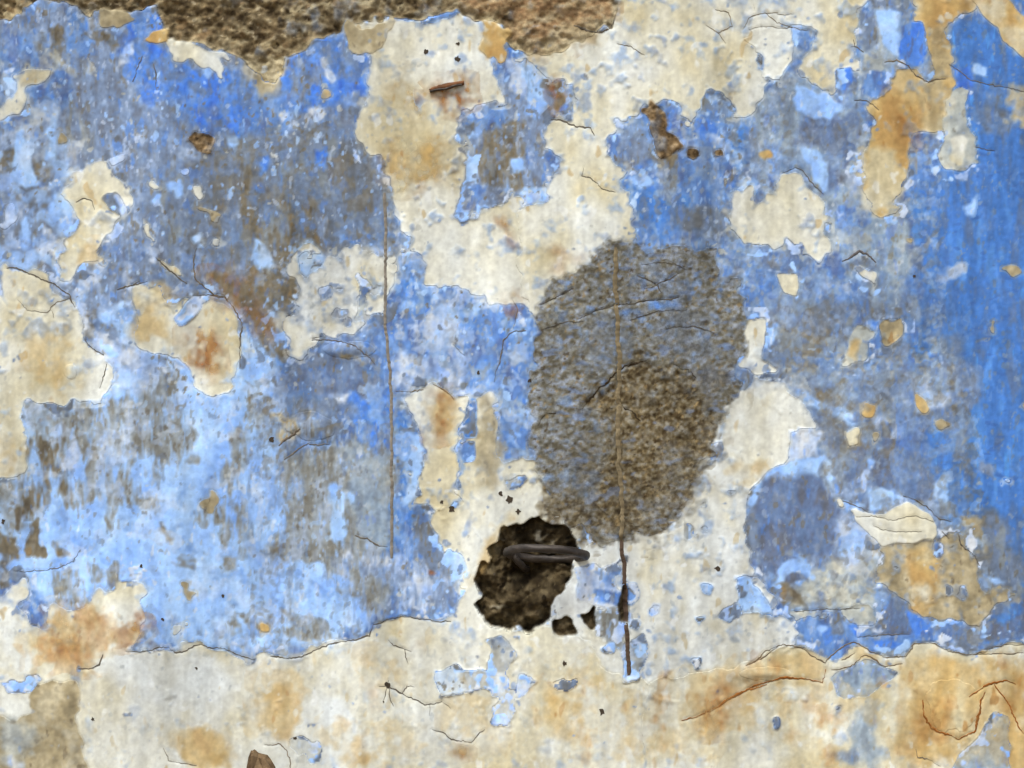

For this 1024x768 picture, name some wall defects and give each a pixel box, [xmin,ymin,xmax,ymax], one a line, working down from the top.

spalling [0,0,37,21]
corrosion [432,83,470,105]
peeling [51,0,868,361]
crack [8,267,75,318]
crack [117,248,243,367]
peeling [0,318,1024,768]
crack [681,633,1024,721]
crack [922,680,1023,740]